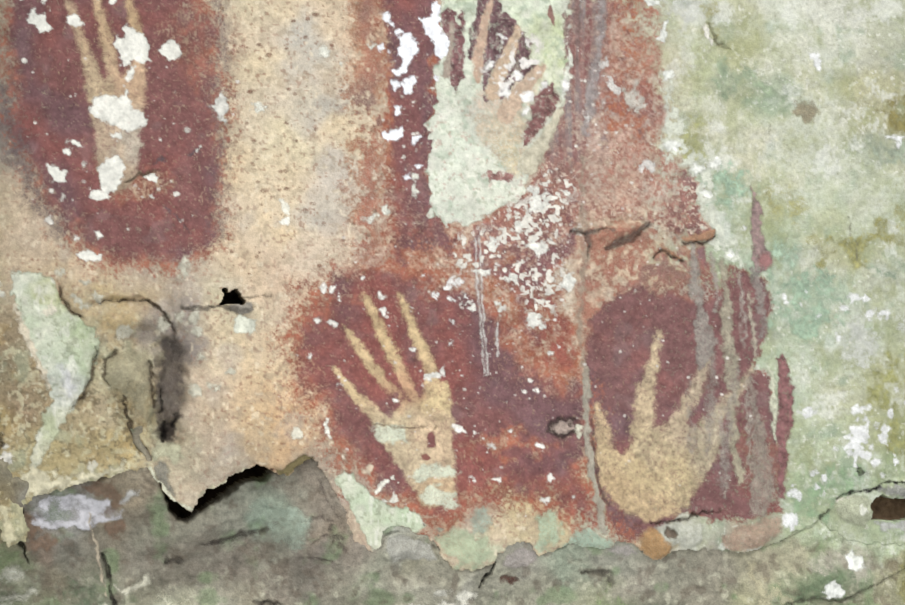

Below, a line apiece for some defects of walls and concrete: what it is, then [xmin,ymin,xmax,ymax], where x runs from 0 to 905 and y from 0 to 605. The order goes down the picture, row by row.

peeling [26,0,52,34]
peeling [66,14,85,27]
water stain [808,48,822,71]
peeling [88,23,183,142]
peeling [45,162,74,202]
peeling [81,154,126,201]
peeling [369,0,747,344]
water stain [330,0,779,534]
water stain [834,292,905,382]
water stain [786,484,802,502]
crack [819,480,905,520]
water stain [780,512,800,531]